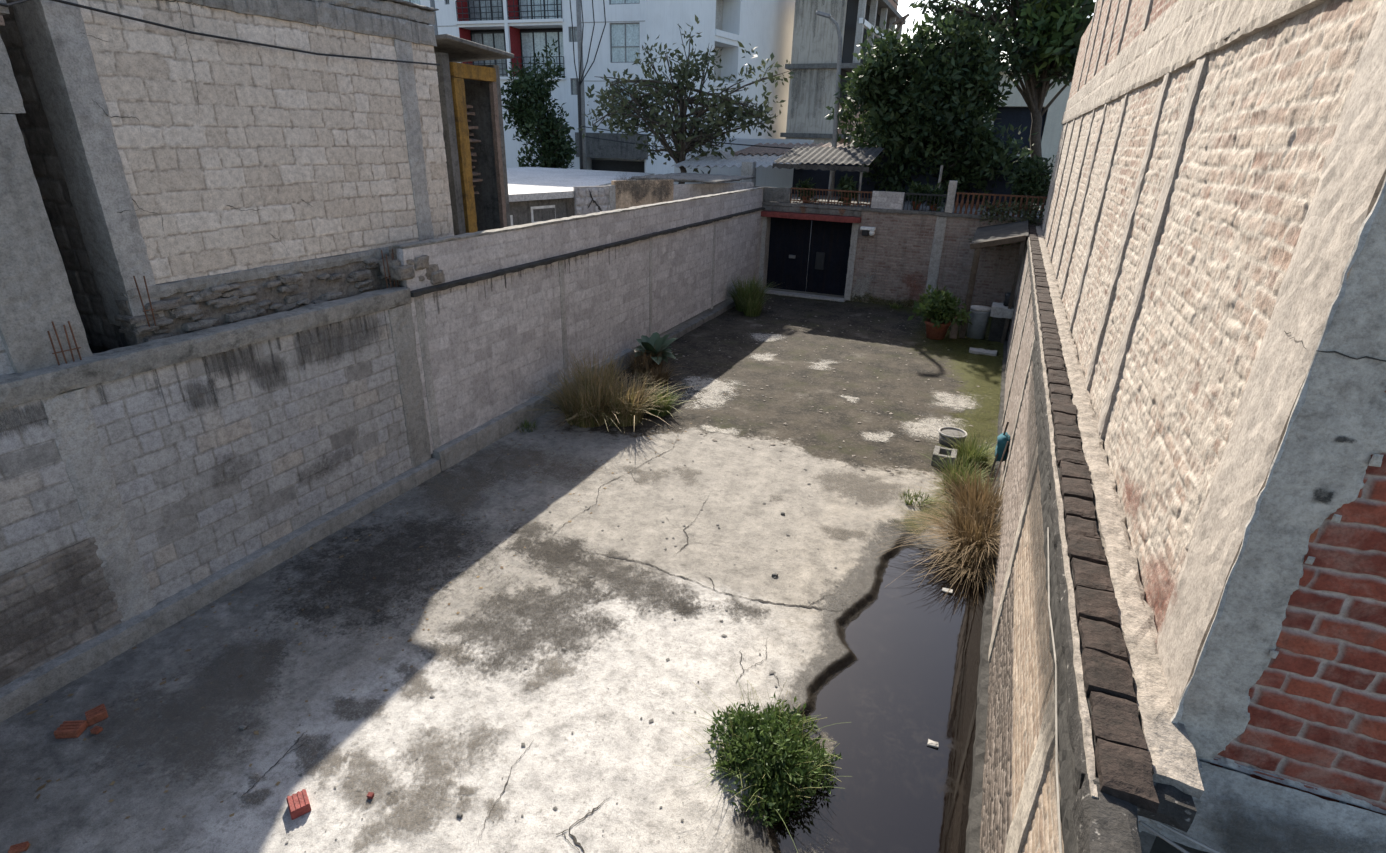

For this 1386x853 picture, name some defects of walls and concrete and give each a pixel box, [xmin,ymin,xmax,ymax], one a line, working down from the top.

spalling [133,276,156,327]
spalling [1171,176,1386,724]
peeling [1196,453,1386,816]
crack [478,741,533,845]
crack [556,797,610,853]